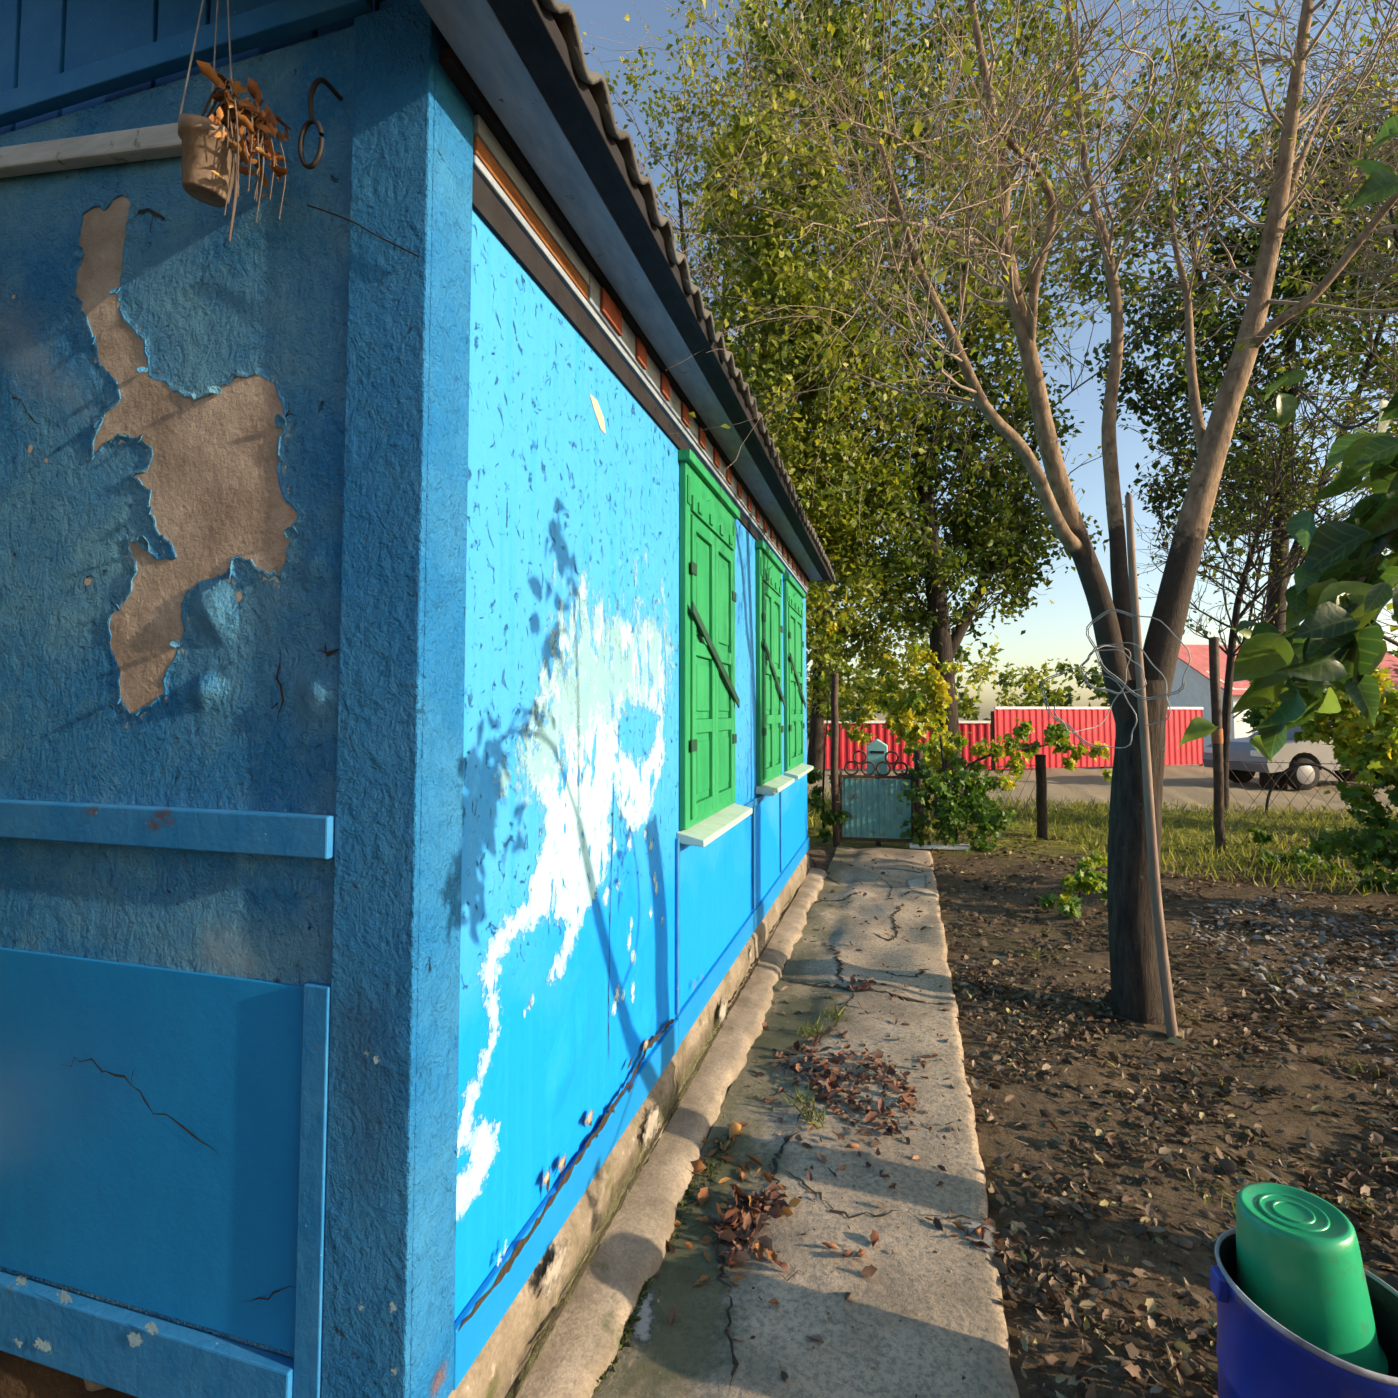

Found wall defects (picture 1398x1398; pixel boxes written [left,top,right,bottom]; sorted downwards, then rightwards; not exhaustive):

peeling [72,188,306,729]
crack [61,1057,217,1153]
peeling [456,552,679,1221]
crack [607,792,615,984]
crack [458,900,792,1380]